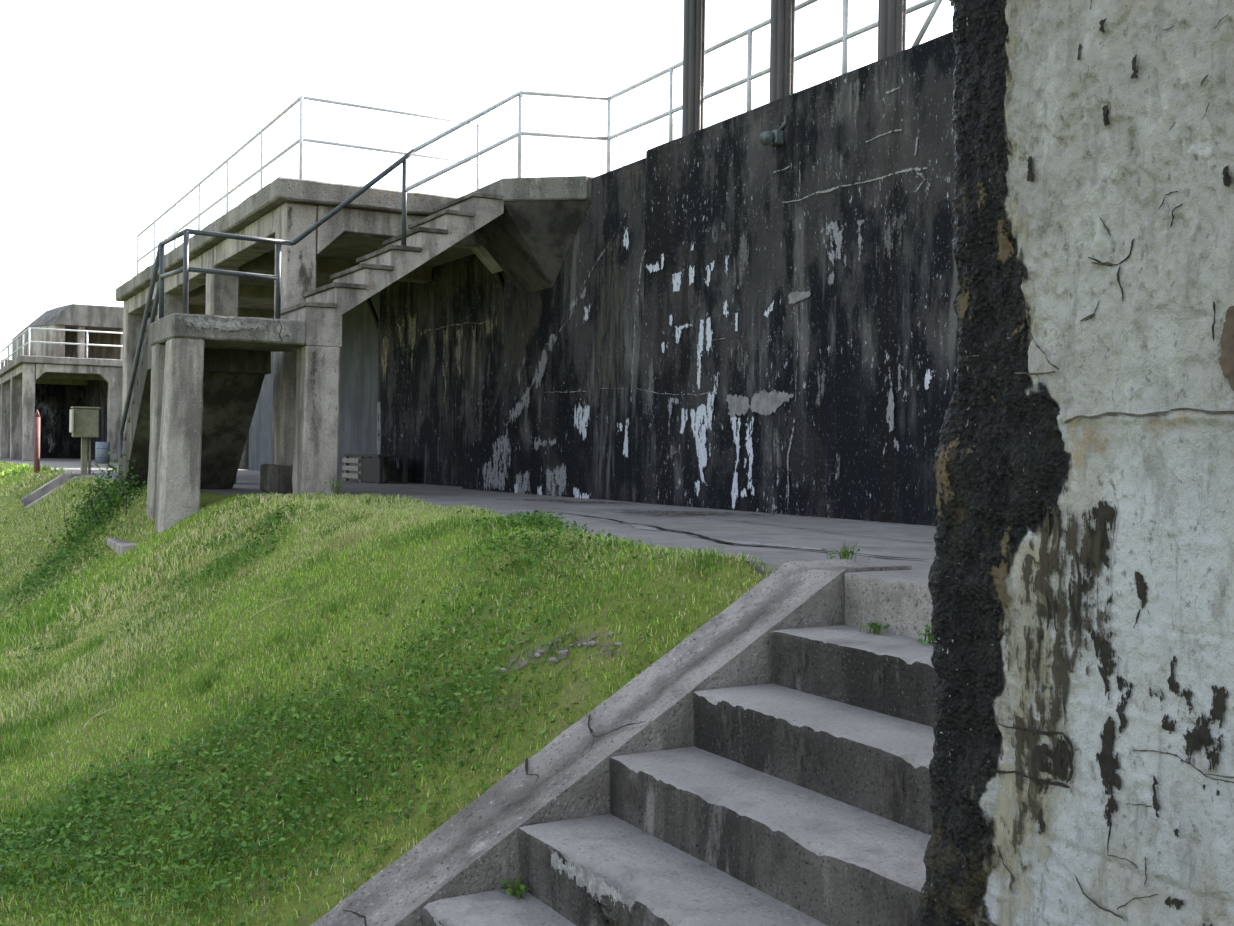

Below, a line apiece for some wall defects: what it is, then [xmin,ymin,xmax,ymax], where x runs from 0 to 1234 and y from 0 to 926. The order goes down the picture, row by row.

peeling [646,254,729,292]
spalling [661,300,794,509]
crack [526,312,930,559]
spalling [764,290,811,318]
damp [879,0,1133,926]
crack [1080,218,1134,321]
crack [1015,335,1234,423]
crack [1210,301,1218,340]
peeling [1219,306,1234,391]
damp [1133,571,1150,628]
damp [1149,654,1229,796]
damp [1152,775,1160,818]